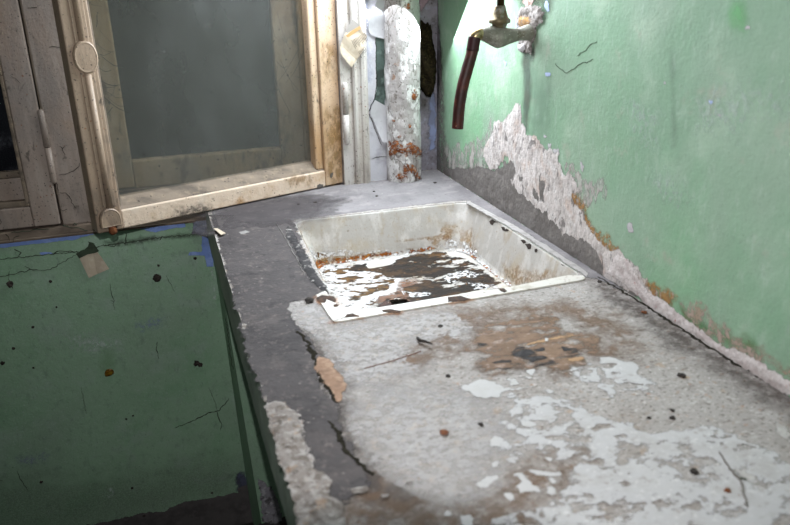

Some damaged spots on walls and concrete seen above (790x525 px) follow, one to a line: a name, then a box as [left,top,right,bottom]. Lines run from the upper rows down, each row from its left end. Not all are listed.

flaking render [515,1,549,54]
corrosion [388,135,422,181]
crack [0,233,198,277]
peeling [444,103,790,398]
damp [521,303,631,357]
spalling [314,356,347,402]
crack [176,389,229,430]
damp [293,303,547,525]
spalling [263,396,347,525]
peeling [461,369,790,525]
crack [719,451,749,508]
peeling [443,510,474,525]